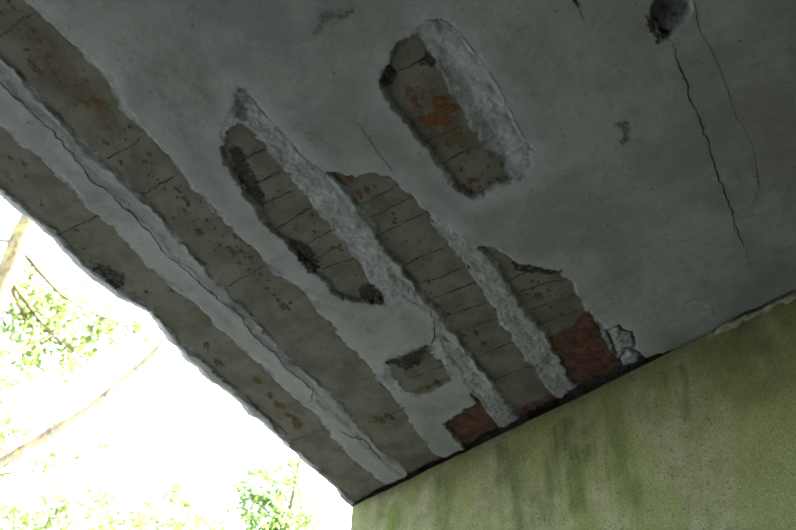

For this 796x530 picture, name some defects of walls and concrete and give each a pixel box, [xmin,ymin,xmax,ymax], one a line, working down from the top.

spalling [649,0,694,42]
crack [232,85,345,175]
crack [671,42,751,268]
crack [693,0,760,203]
crack [0,82,313,403]
spalling [0,0,647,505]
spalling [708,290,796,339]
crack [245,395,288,435]
crack [339,430,381,460]